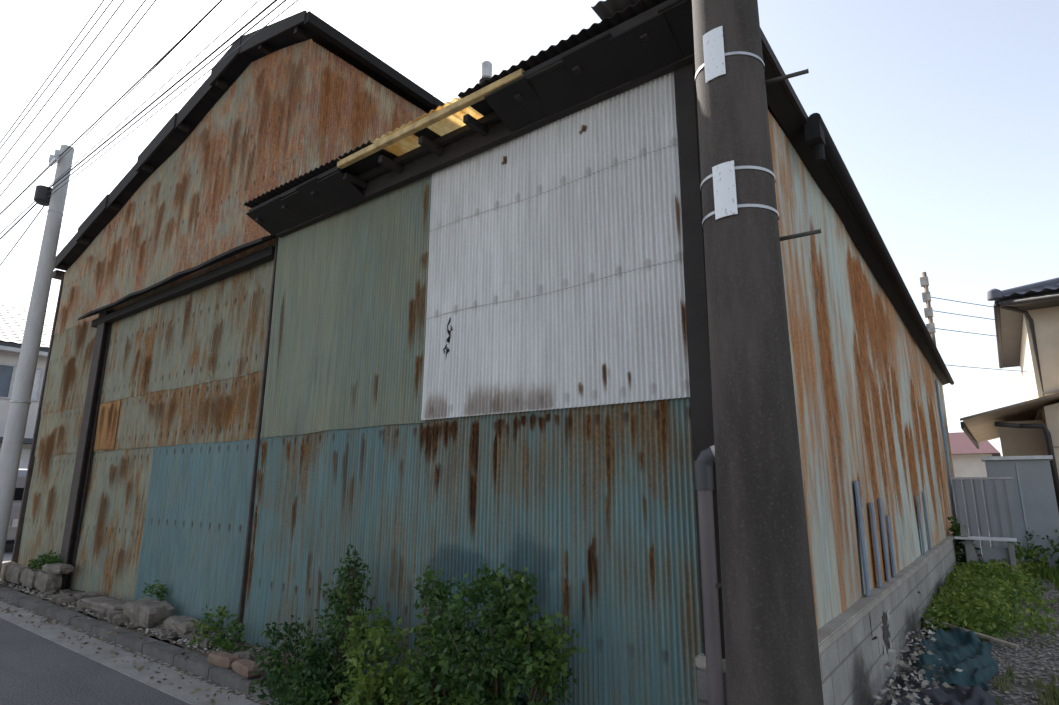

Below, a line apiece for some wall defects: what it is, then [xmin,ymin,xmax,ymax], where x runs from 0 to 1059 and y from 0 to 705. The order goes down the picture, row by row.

rust [320,68,371,151]
rust [408,282,426,343]
rust [94,400,121,450]
rust [414,355,423,389]
rust [419,420,457,485]
rust [469,422,479,533]
rust [493,412,572,482]
rust [659,400,668,442]
rust [811,230,841,488]
rust [847,253,943,532]
rust [564,538,598,622]